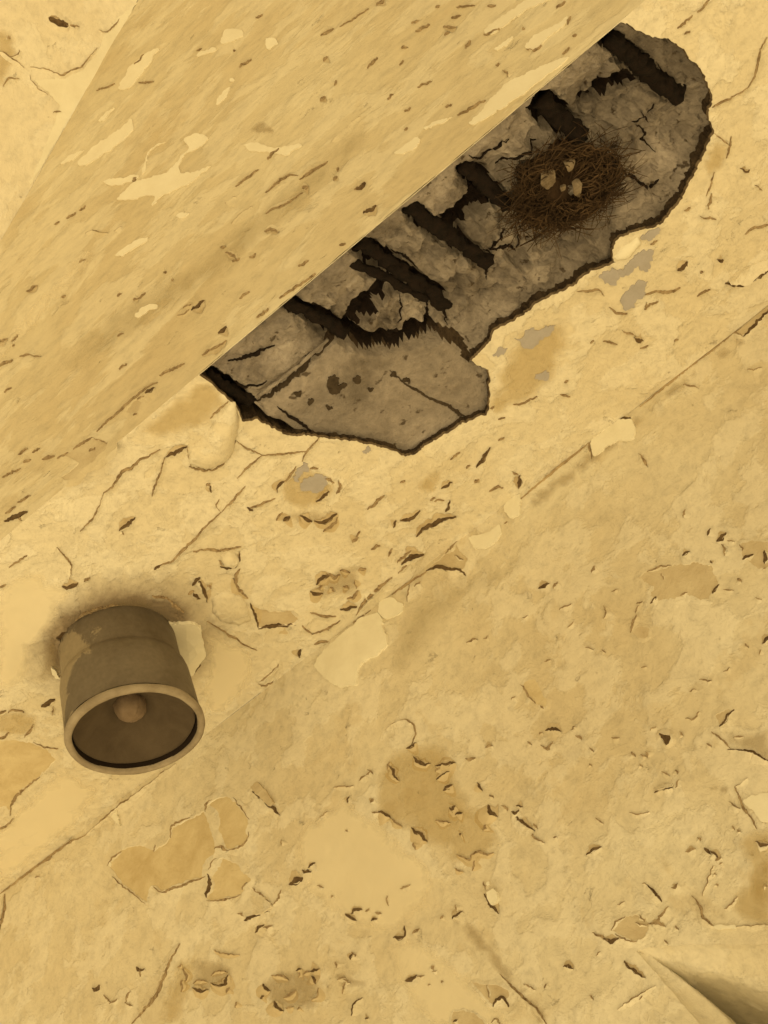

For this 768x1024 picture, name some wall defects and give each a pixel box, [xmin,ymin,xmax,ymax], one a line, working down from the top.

peeling [103,133,211,206]
spalling [196,0,716,459]
crack [210,401,228,419]
crack [80,449,161,532]
peeling [151,577,213,676]
crack [154,438,320,574]
peeling [193,546,366,639]
peeling [271,462,350,533]
peeling [292,437,530,688]
peeling [629,528,768,643]
peeling [102,782,335,938]
peeling [333,742,558,875]